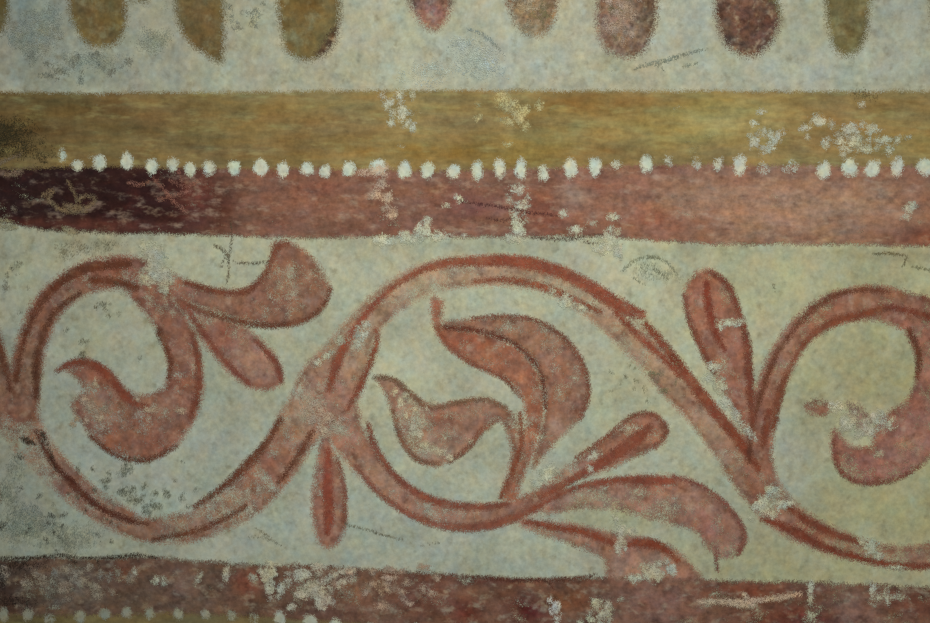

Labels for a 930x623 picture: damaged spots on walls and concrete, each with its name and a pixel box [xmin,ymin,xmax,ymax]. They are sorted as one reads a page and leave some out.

peeling [746,107,786,155]
peeling [798,112,912,160]
peeling [547,596,562,623]
peeling [578,596,624,623]